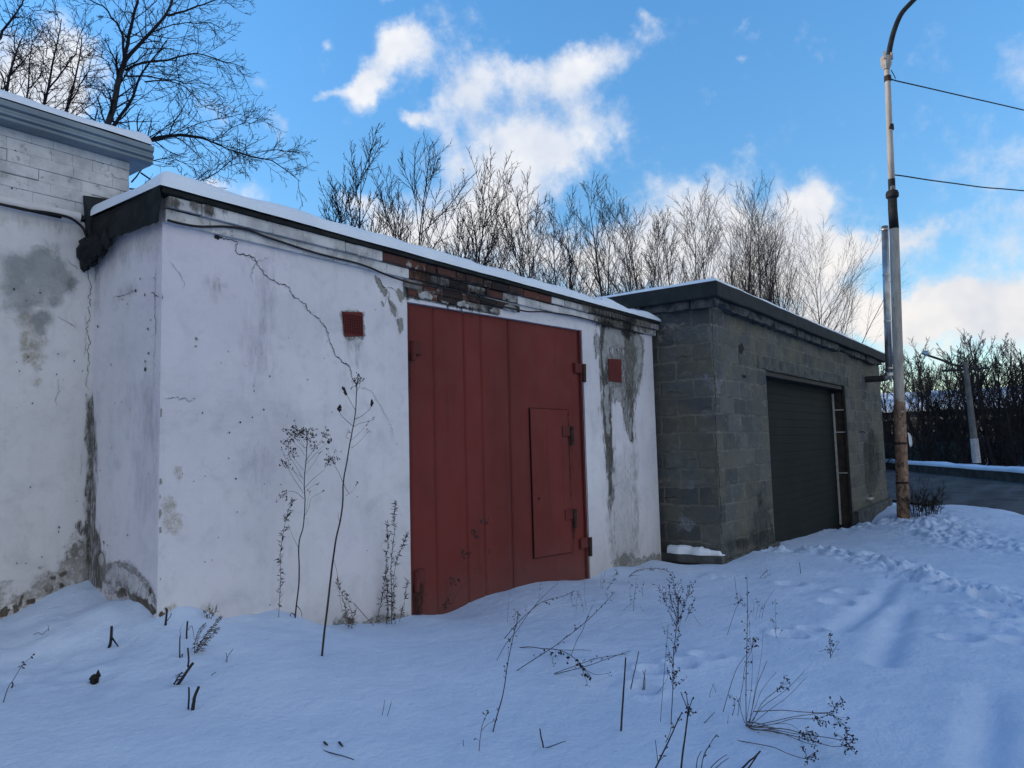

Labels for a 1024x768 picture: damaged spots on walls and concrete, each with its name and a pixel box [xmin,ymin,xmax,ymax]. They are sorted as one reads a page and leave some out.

leakage [0,397,156,614]
crack [59,262,190,402]
crack [206,210,393,430]
flaking render [375,275,520,333]
leakage [582,295,651,512]